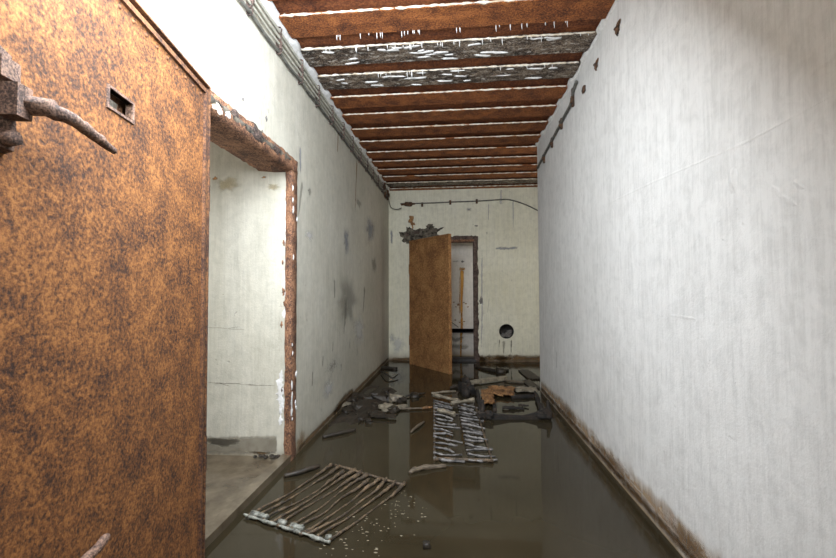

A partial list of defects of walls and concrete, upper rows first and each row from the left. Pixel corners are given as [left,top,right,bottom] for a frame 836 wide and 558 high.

spalling [391,224,444,244]
leakage [541,384,708,558]